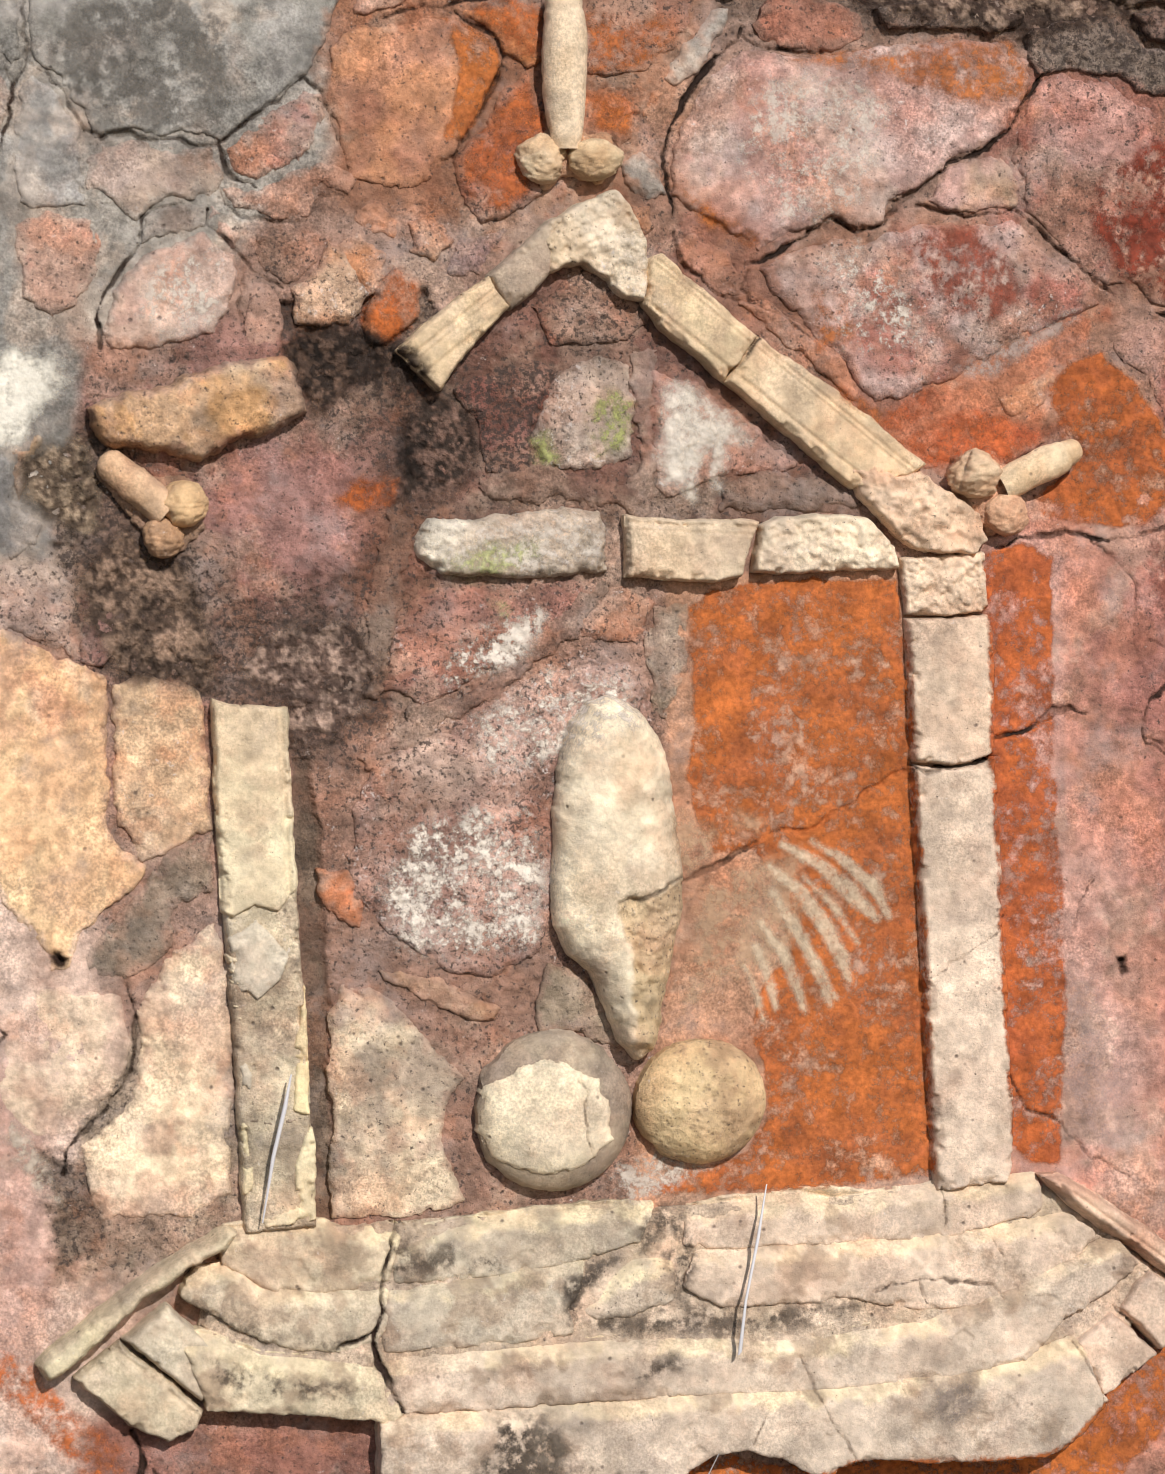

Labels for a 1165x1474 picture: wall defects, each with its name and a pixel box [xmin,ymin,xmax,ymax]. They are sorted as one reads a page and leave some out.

crack [1141,684,1165,754]
crack [960,724,1035,765]
crack [722,829,781,862]
crack [134,1438,157,1474]